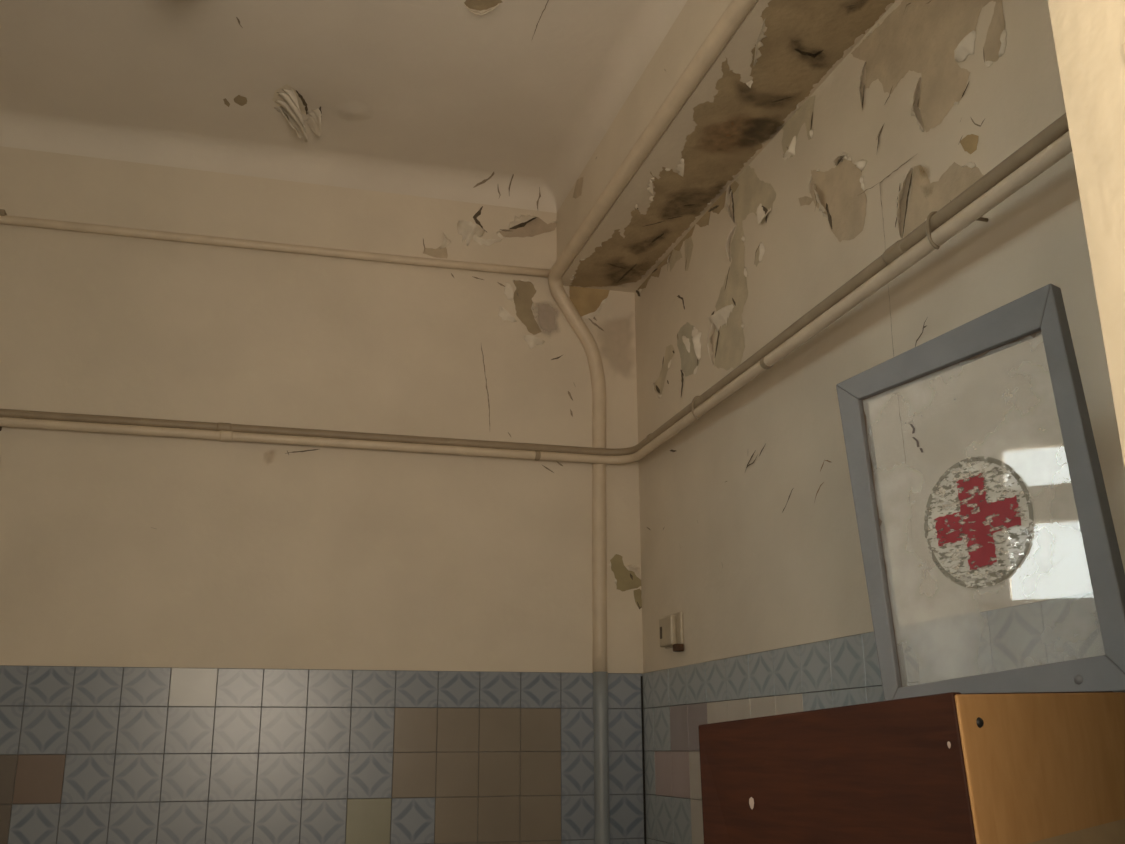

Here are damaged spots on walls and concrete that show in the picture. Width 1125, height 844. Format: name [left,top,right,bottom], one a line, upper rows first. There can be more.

spalling [464,0,502,15]
peeling [272,84,322,143]
peeling [423,187,557,258]
peeling [569,0,1007,398]
peeling [497,279,545,349]
peeling [609,554,642,610]